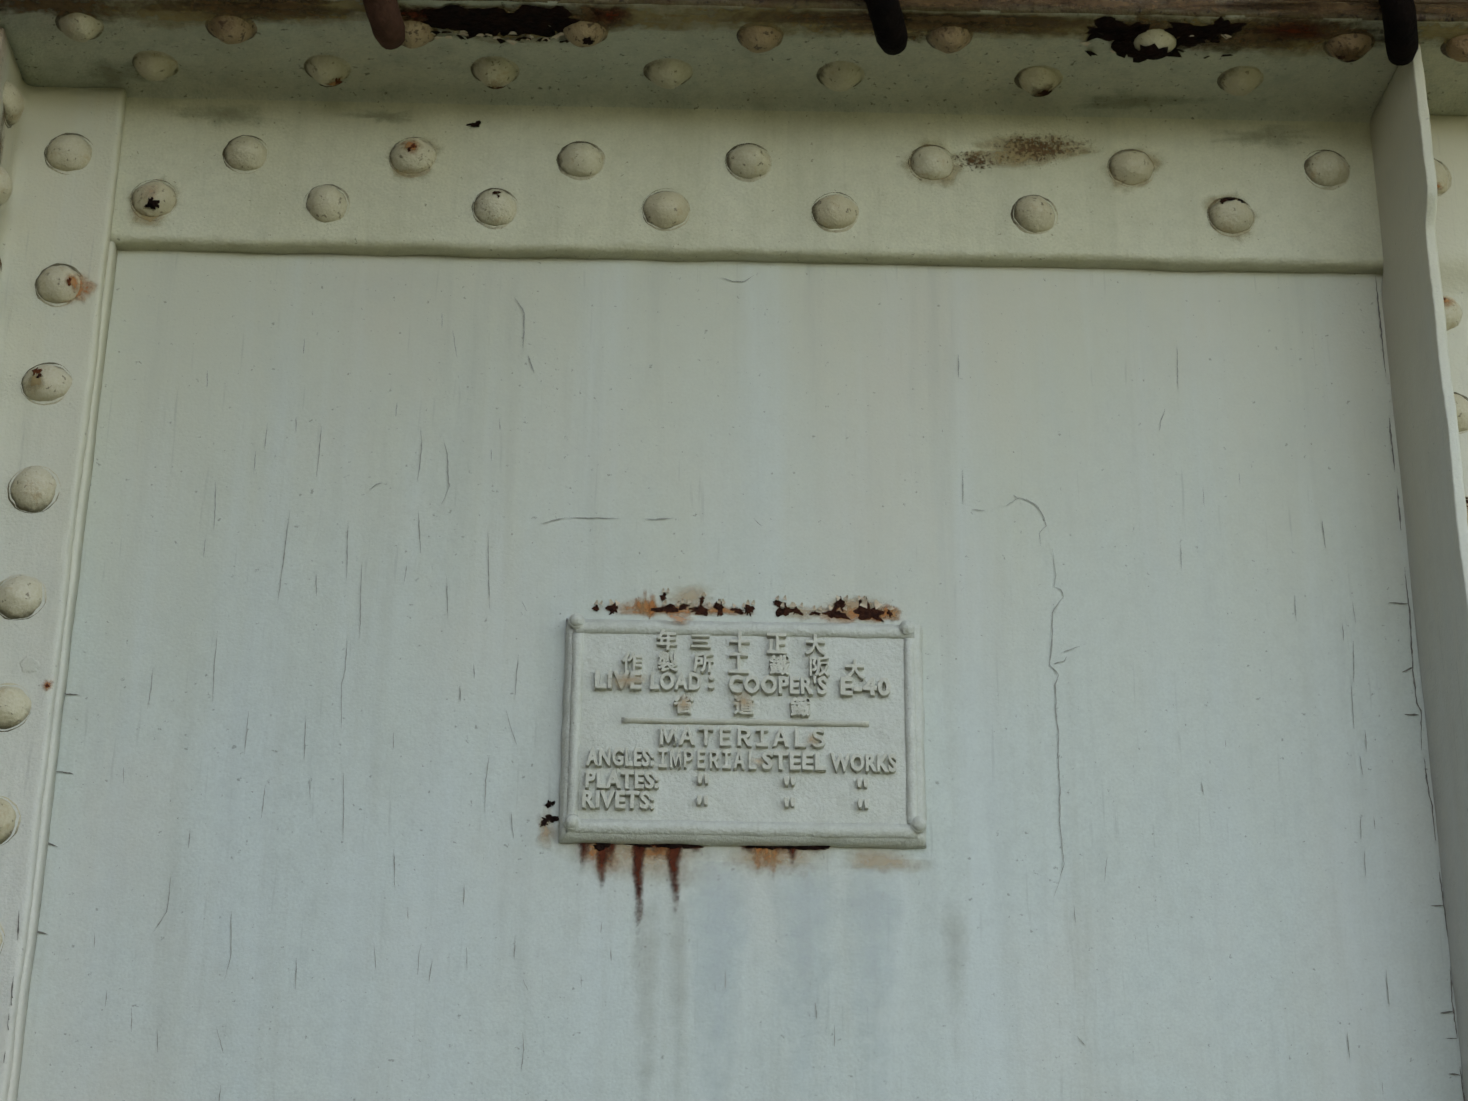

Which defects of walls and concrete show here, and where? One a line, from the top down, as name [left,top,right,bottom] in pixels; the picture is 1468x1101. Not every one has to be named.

rust [941,133,1092,182]
rust [623,596,735,623]
rust [833,605,898,621]
crack [962,470,1080,923]
rust [580,843,704,913]